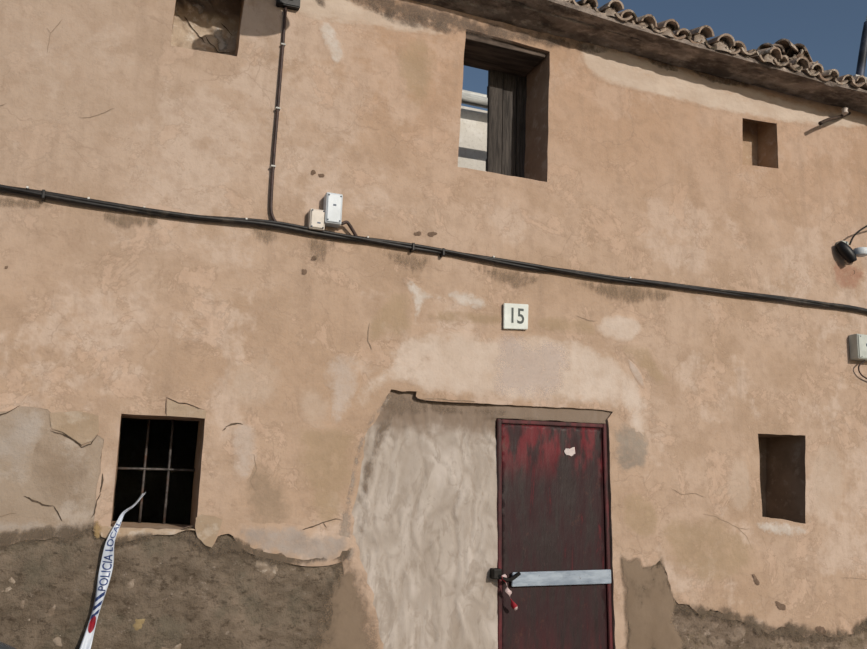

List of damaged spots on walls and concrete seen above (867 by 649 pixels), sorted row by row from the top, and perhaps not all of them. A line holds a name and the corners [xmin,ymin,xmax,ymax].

peeling [44,409,104,472]
spalling [0,476,343,649]